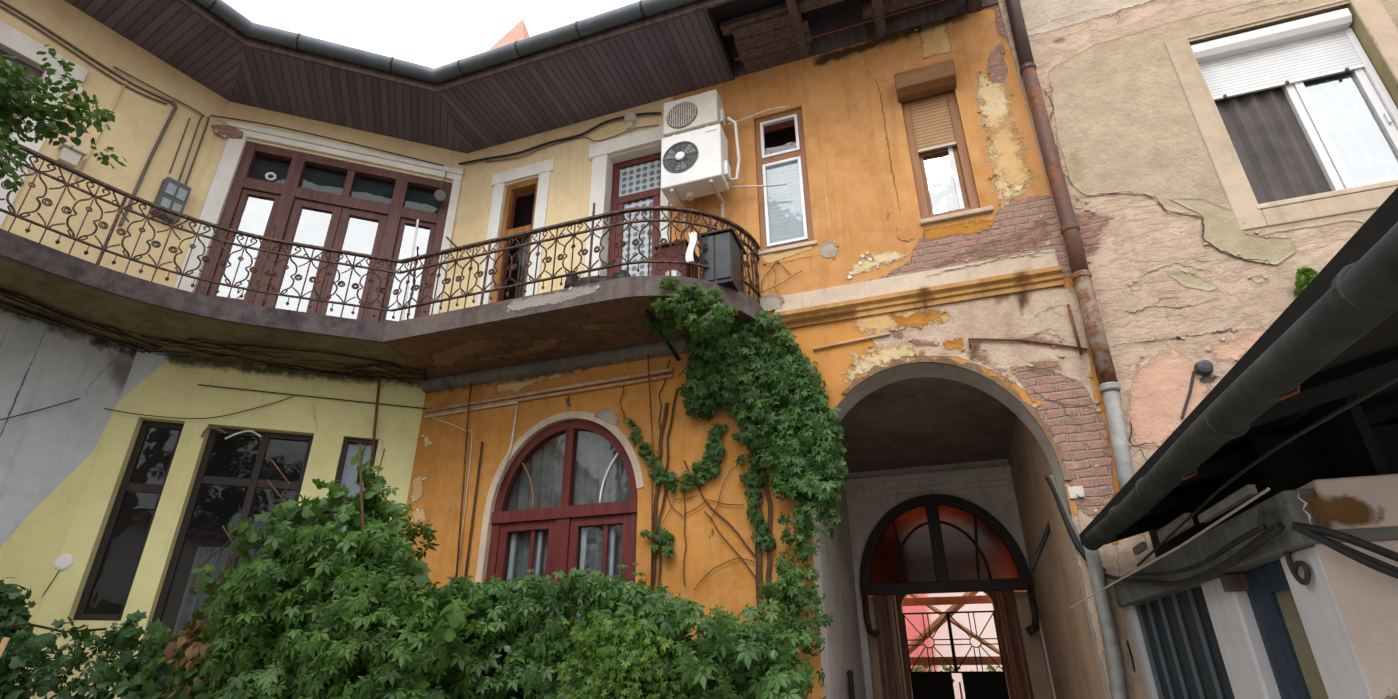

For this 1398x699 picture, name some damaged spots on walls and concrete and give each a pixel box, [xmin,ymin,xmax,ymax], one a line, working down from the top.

crack [1023,305,1076,345]
spalling [841,4,1266,699]
crack [1042,86,1280,347]